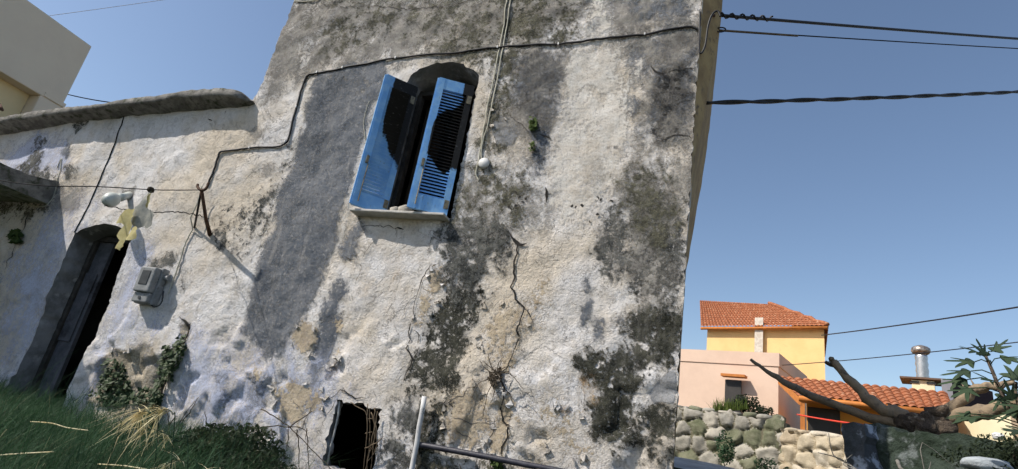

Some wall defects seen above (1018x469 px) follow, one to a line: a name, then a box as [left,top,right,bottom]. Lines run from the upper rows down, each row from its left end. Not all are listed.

spalling [85,324,191,422]
damp [210,0,702,469]
crack [434,203,533,469]